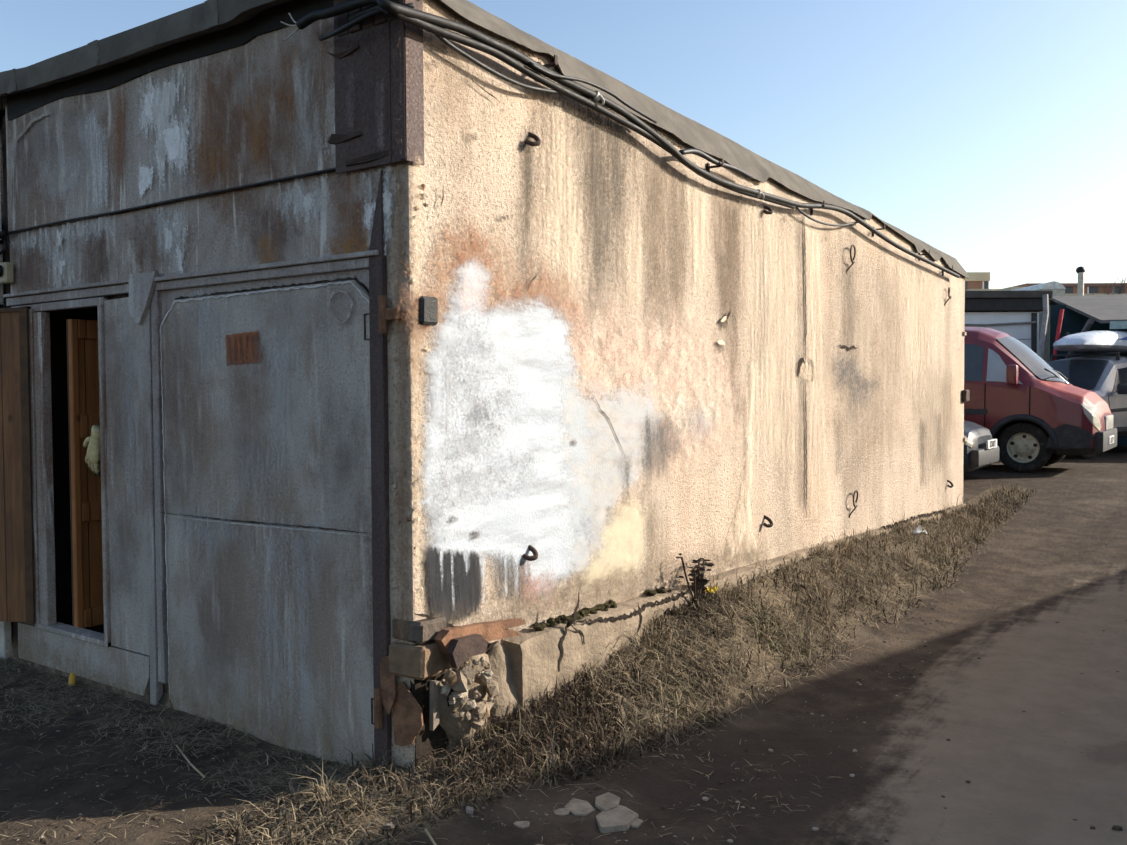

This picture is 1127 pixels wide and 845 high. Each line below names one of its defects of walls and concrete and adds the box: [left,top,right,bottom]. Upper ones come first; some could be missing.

damp [646,164,795,464]
spalling [439,640,519,748]